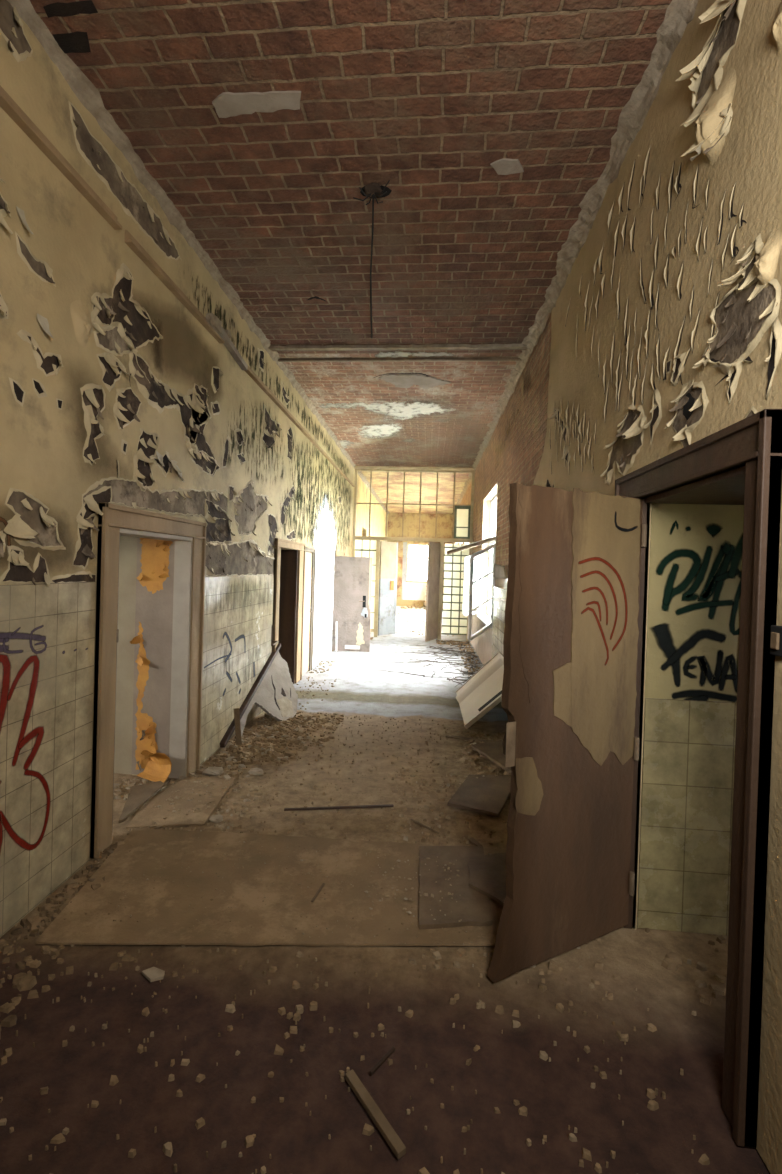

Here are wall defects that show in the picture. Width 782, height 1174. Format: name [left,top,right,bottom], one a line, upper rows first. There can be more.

spalling [43,0,98,18]
spalling [52,31,91,54]
peeling [676,0,747,156]
peeling [0,179,56,287]
peeling [68,100,182,260]
peeling [0,263,296,594]
water stain [189,278,456,669]
flaking render [600,233,782,485]